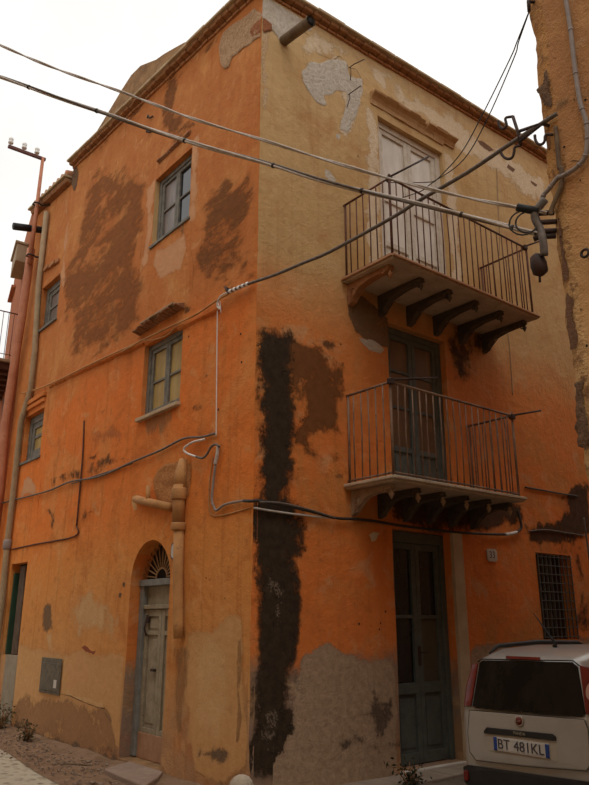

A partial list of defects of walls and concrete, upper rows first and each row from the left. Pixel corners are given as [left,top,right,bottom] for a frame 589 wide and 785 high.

leakage [64,166,143,354]
leakage [197,177,253,278]
spalling [219,0,303,110]
spalling [298,28,382,262]
peeling [370,66,544,282]
leakage [249,328,344,778]
leakage [392,484,589,544]